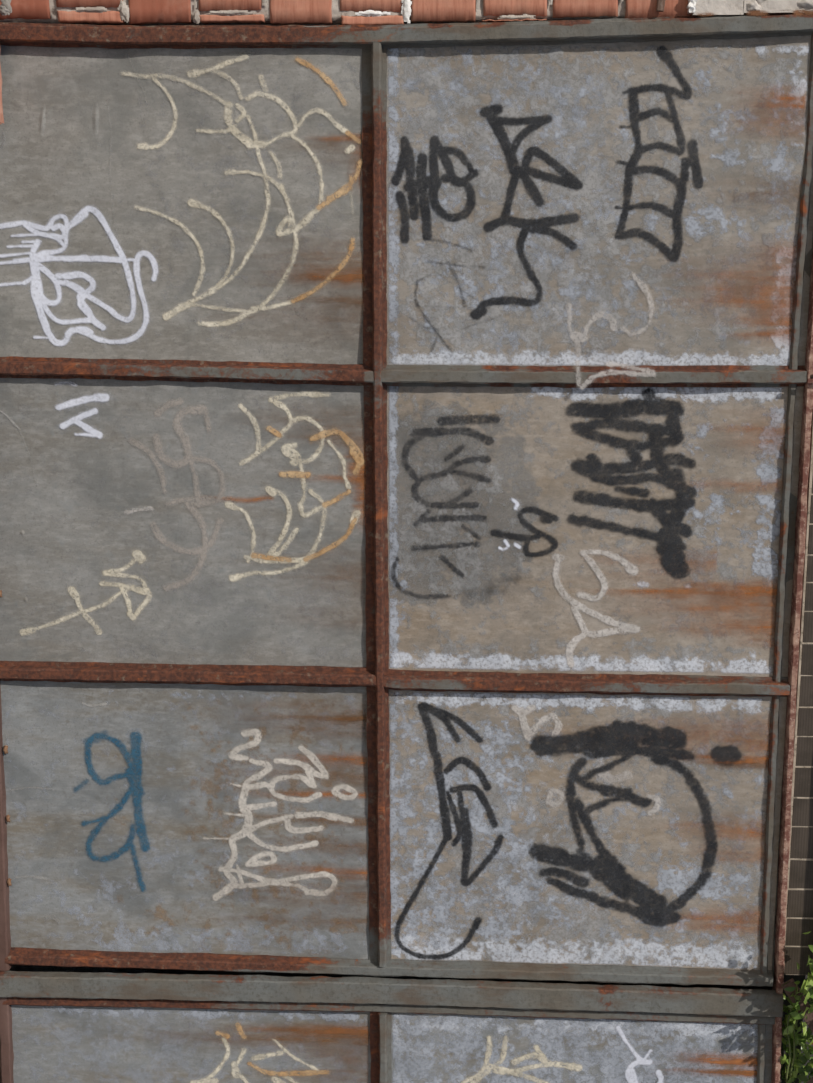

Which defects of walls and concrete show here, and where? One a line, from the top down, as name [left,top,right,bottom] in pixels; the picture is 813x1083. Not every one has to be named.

flaking render [686,0,697,14]
flaking render [743,0,766,14]
flaking render [797,0,813,10]
corrosion [634,585,777,610]